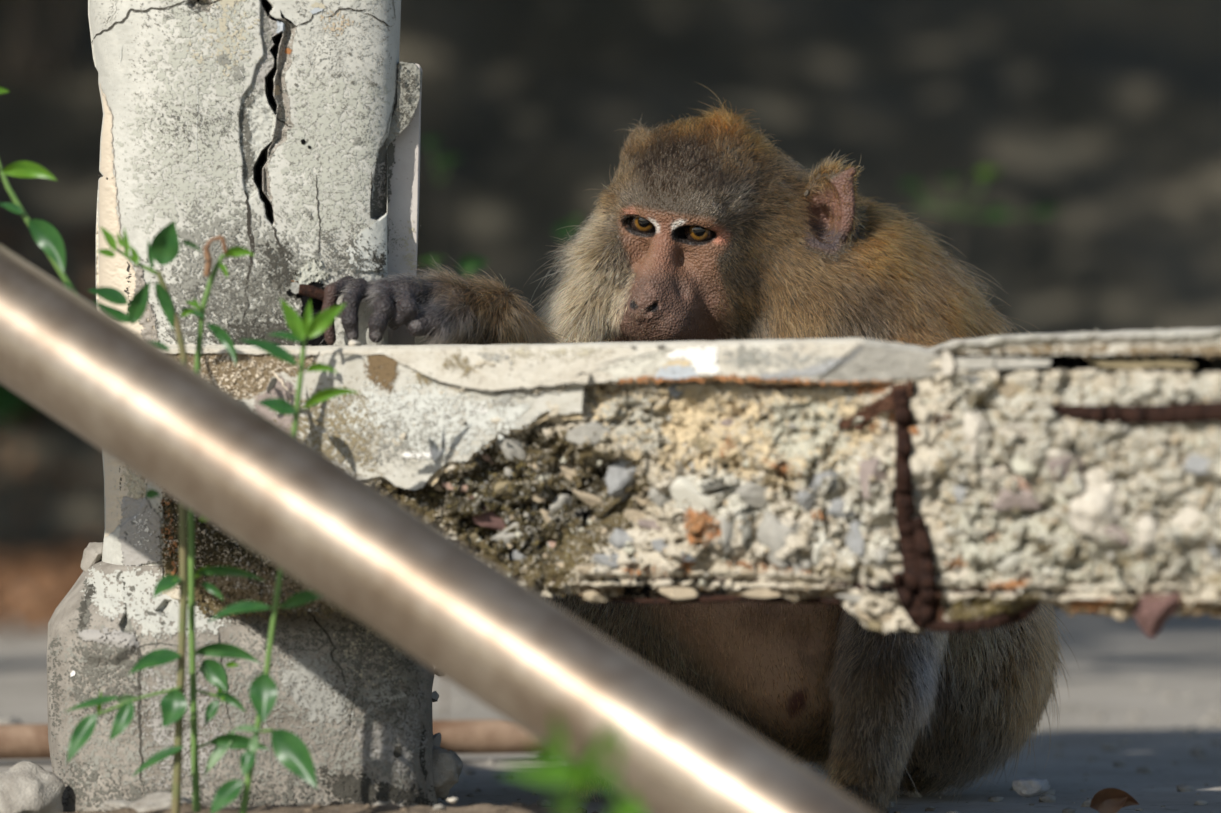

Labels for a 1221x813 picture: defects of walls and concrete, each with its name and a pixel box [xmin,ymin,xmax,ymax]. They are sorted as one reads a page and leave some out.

crack [98,88,132,314]
crack [91,0,220,62]
crack [239,0,397,326]
spalling [326,329,1221,638]